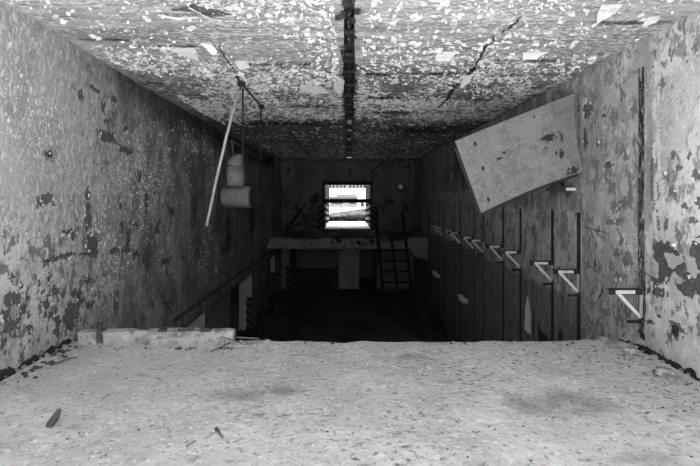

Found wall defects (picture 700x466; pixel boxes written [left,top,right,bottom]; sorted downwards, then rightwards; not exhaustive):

peeling [9,0,683,160]
crack [439,15,524,108]
peeling [0,169,152,382]
peeling [607,196,629,282]
peeling [644,60,700,342]